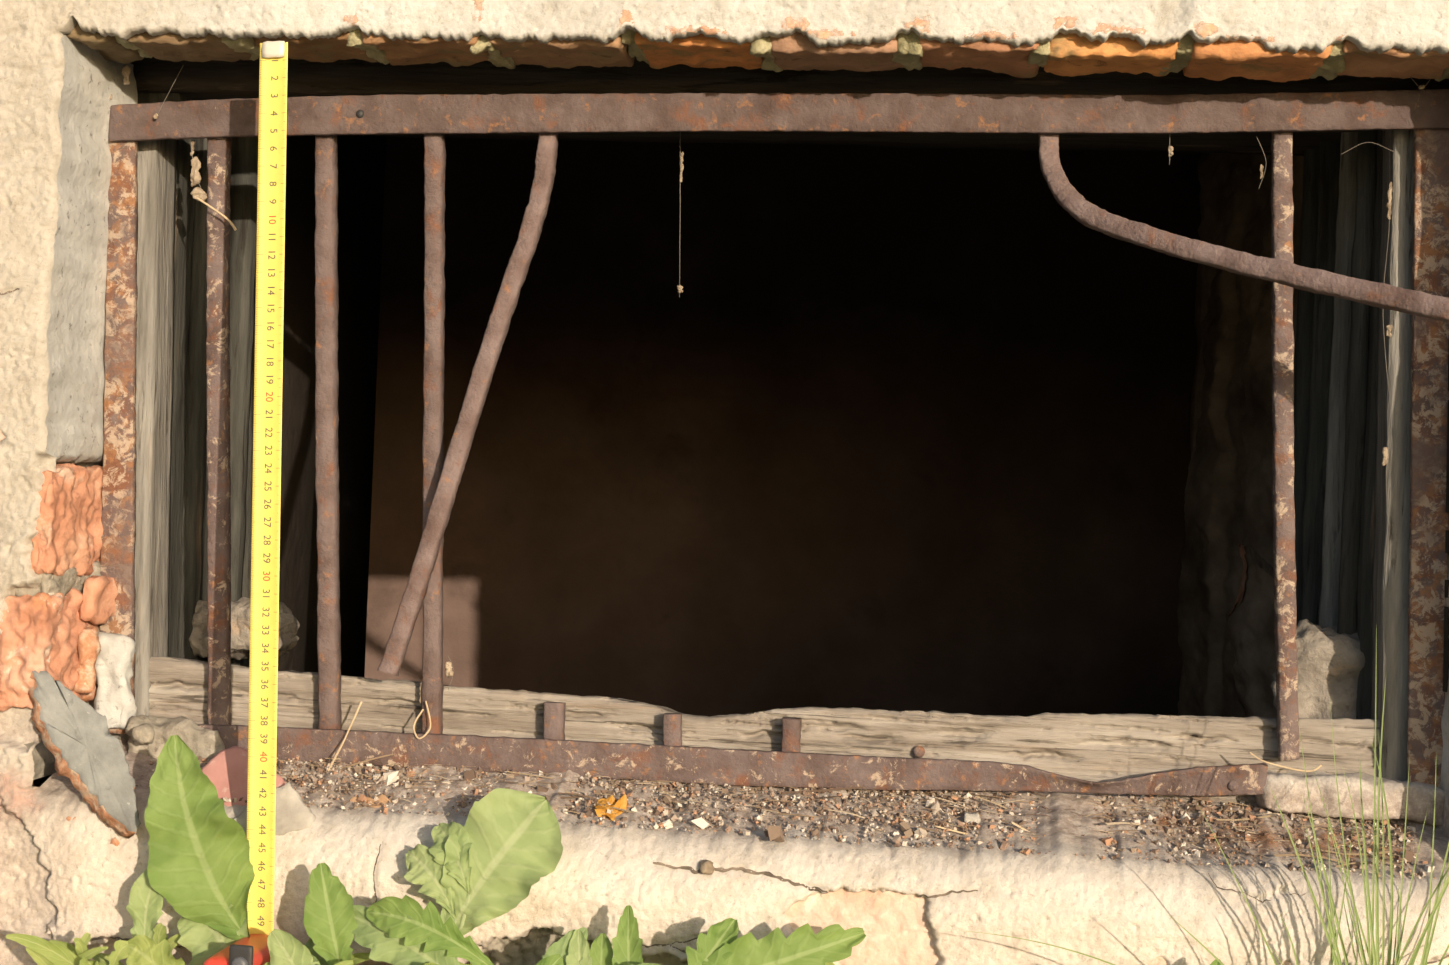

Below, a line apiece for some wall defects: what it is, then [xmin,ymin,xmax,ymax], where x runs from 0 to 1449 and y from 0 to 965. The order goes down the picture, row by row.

peeling [665,25,727,35]
peeling [782,17,855,39]
peeling [905,17,929,33]
peeling [964,31,1017,40]
peeling [1053,16,1076,29]
peeling [1093,23,1146,35]
peeling [1195,22,1275,42]
crack [653,862,827,894]
crack [919,890,978,898]
spalling [786,888,939,965]